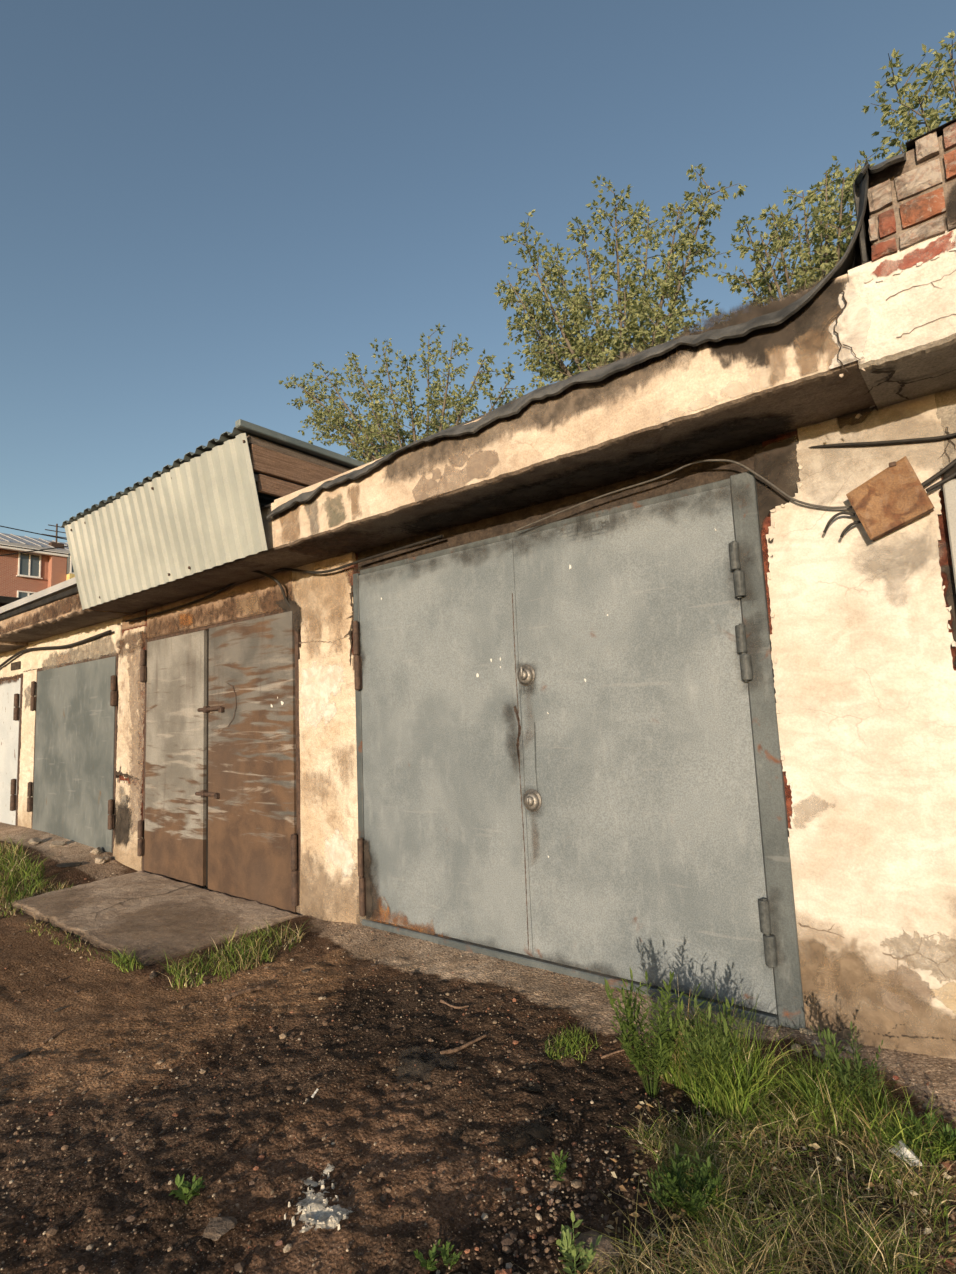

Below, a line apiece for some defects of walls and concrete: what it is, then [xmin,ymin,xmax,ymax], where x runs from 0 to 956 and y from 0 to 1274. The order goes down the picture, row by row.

damp [770,312,855,384]
crack [824,290,956,426]
flaking render [829,231,956,378]
crack [886,271,956,338]
flaking render [941,565,956,666]
corrosion [371,886,443,937]
damp [798,935,956,1057]